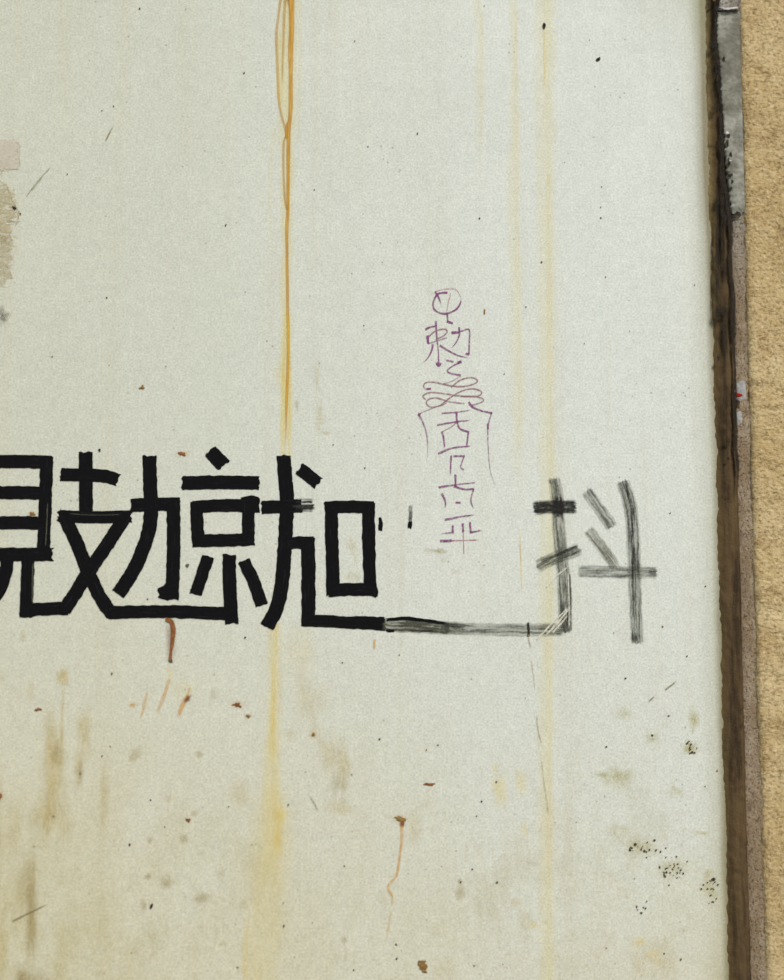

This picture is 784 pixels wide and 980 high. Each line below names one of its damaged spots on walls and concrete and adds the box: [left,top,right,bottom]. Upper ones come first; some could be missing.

corrosion [283,0,294,418]
corrosion [166,617,176,663]